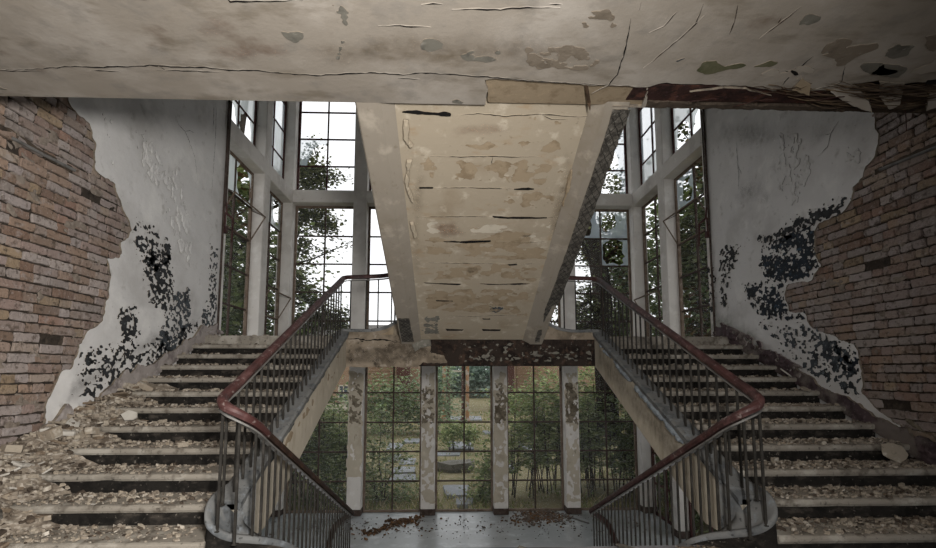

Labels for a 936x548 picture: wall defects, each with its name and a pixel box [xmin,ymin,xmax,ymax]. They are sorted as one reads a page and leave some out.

crack [228,0,303,8]
crack [729,5,738,34]
crack [0,2,704,93]
peeling [821,35,936,78]
spalling [402,99,463,117]
crack [454,112,588,140]
peeling [419,157,437,189]
spalling [0,87,219,447]
peeling [422,159,563,334]
spalling [705,112,936,443]